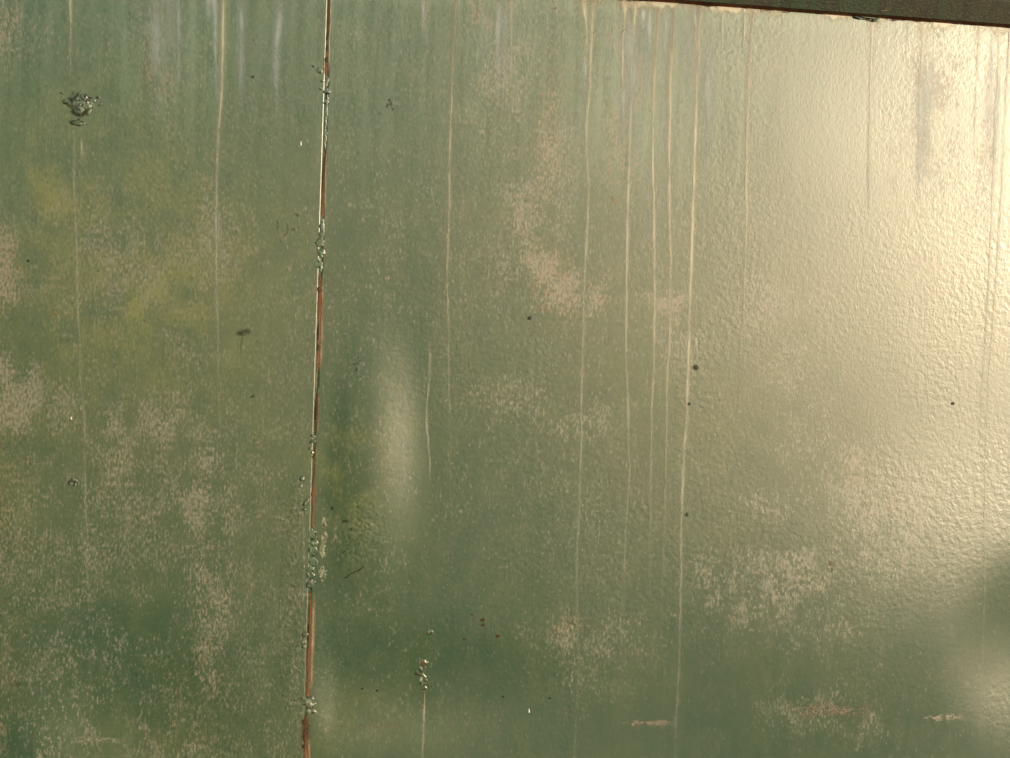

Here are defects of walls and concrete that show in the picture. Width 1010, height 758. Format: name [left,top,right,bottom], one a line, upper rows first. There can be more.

damp [581,0,601,179]
damp [907,22,953,135]
damp [977,26,1010,344]
damp [621,0,758,617]
corrosion [311,393,319,528]
corrosion [302,715,310,758]